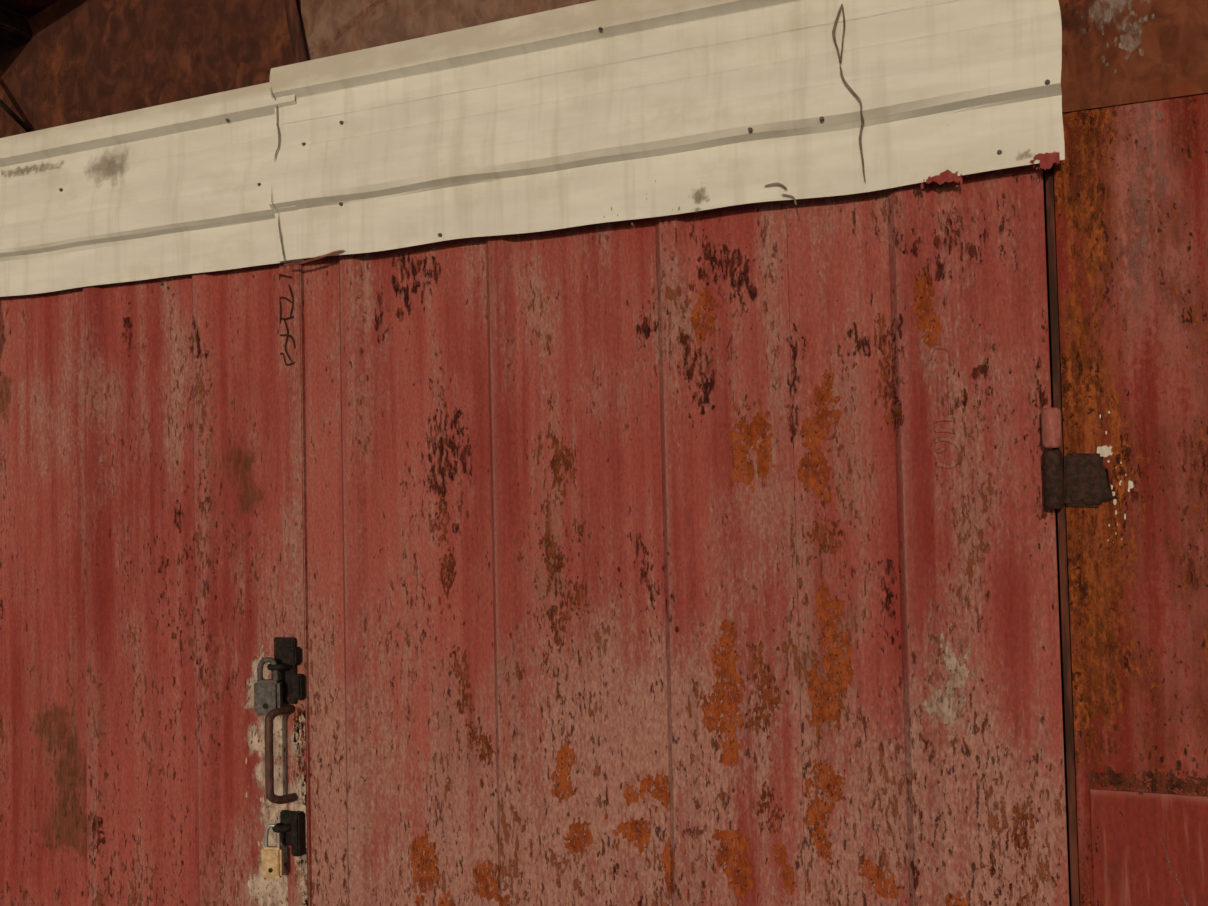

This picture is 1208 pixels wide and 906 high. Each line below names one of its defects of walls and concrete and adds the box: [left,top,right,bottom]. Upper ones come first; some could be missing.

corrosion [723,385,775,492]
corrosion [872,311,905,432]
corrosion [427,395,478,625]
corrosion [796,368,853,731]
corrosion [699,617,781,772]
peeling [923,623,975,740]
peeling [246,646,308,906]
corrosion [401,831,463,906]
corrosion [473,860,510,906]
corrosion [563,769,674,906]
corrosion [752,759,901,903]
corrosion [1086,748,1208,796]